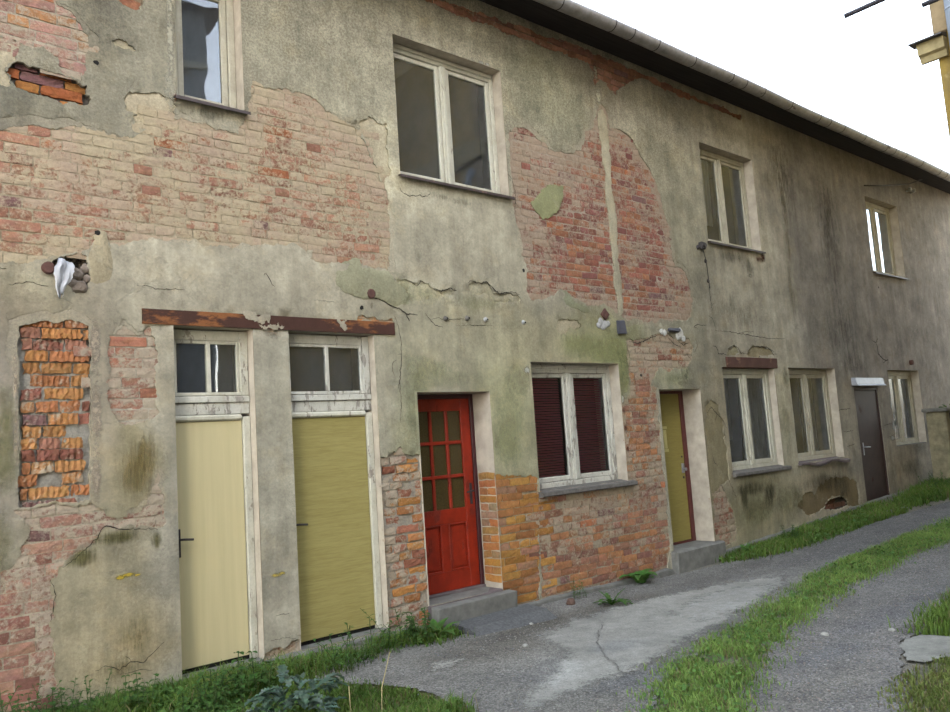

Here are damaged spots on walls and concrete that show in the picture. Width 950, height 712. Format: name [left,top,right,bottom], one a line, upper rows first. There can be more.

peeling [0,0,99,105]
spalling [117,0,143,10]
peeling [425,0,741,120]
peeling [0,81,454,307]
peeling [242,309,284,330]
crack [375,298,492,419]
crack [410,281,520,295]
peeling [469,103,695,605]
spalling [0,309,167,712]
spalling [378,447,430,631]
peeling [704,400,737,545]
peeling [798,477,859,515]